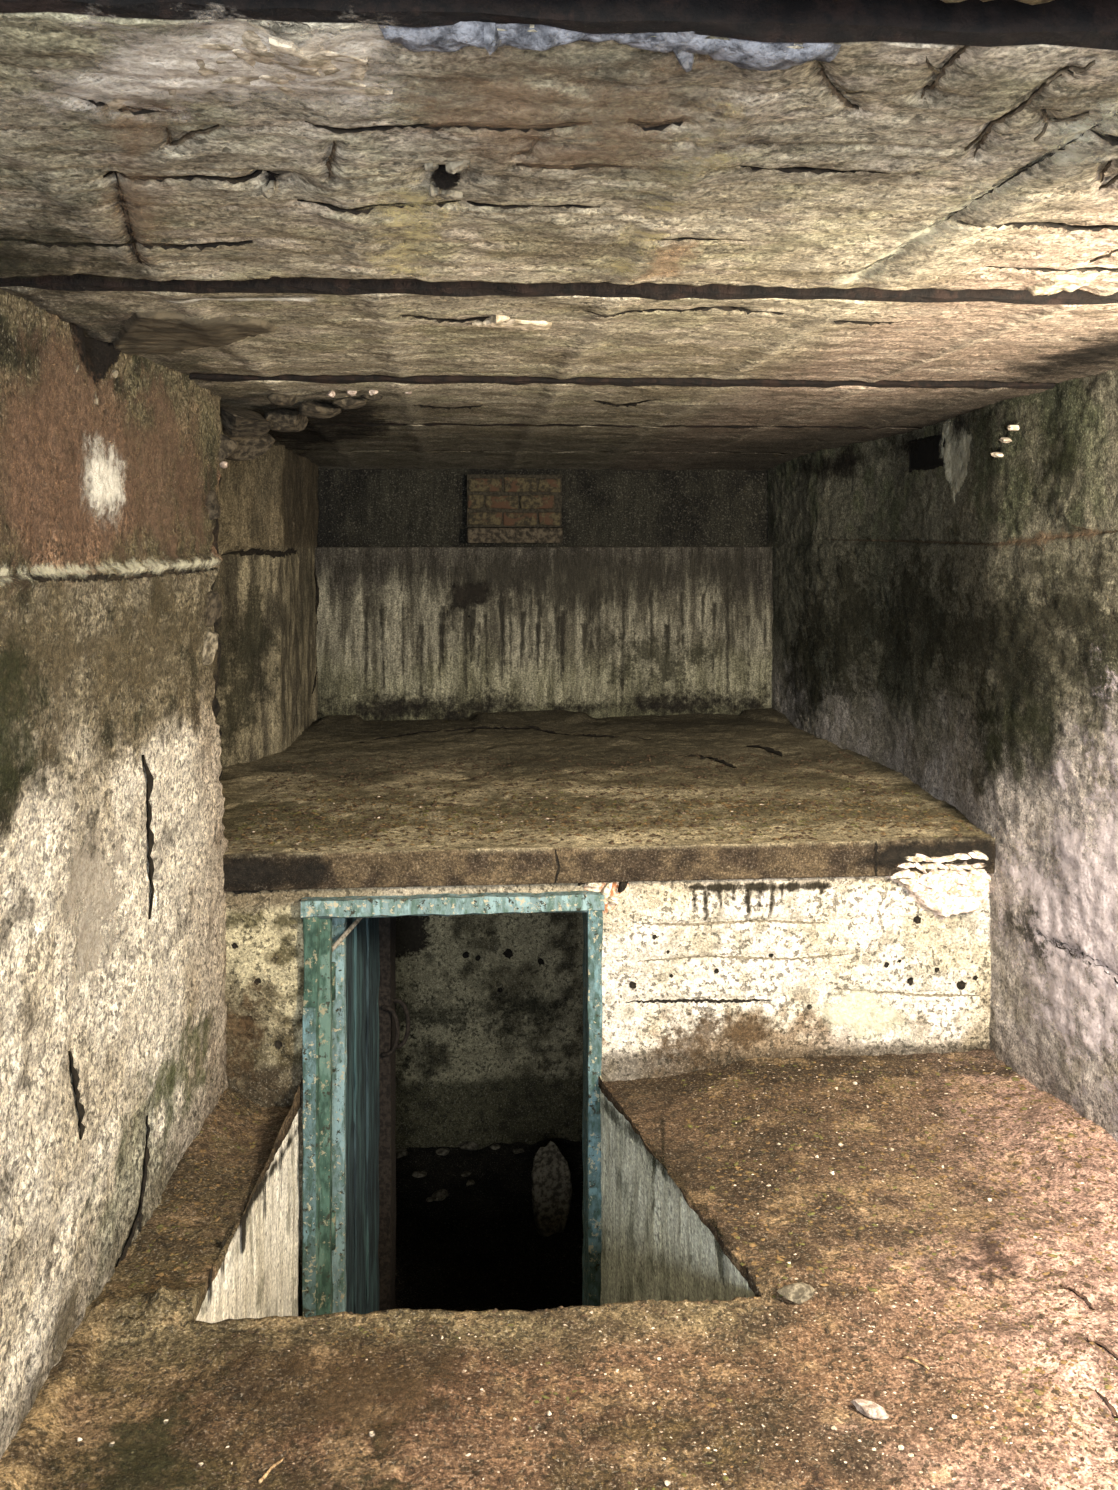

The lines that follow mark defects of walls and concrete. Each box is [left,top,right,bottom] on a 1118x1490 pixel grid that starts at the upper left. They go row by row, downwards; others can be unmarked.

crack [0,97,263,264]
crack [297,121,632,215]
crack [628,118,684,131]
crack [720,165,883,175]
crack [859,60,1118,276]
leakage [0,543,280,770]
leakage [334,545,772,721]
crack [142,755,155,919]
leakage [689,881,853,921]
spalling [886,850,991,924]
leakage [786,539,1118,1100]
crack [68,1051,85,1140]